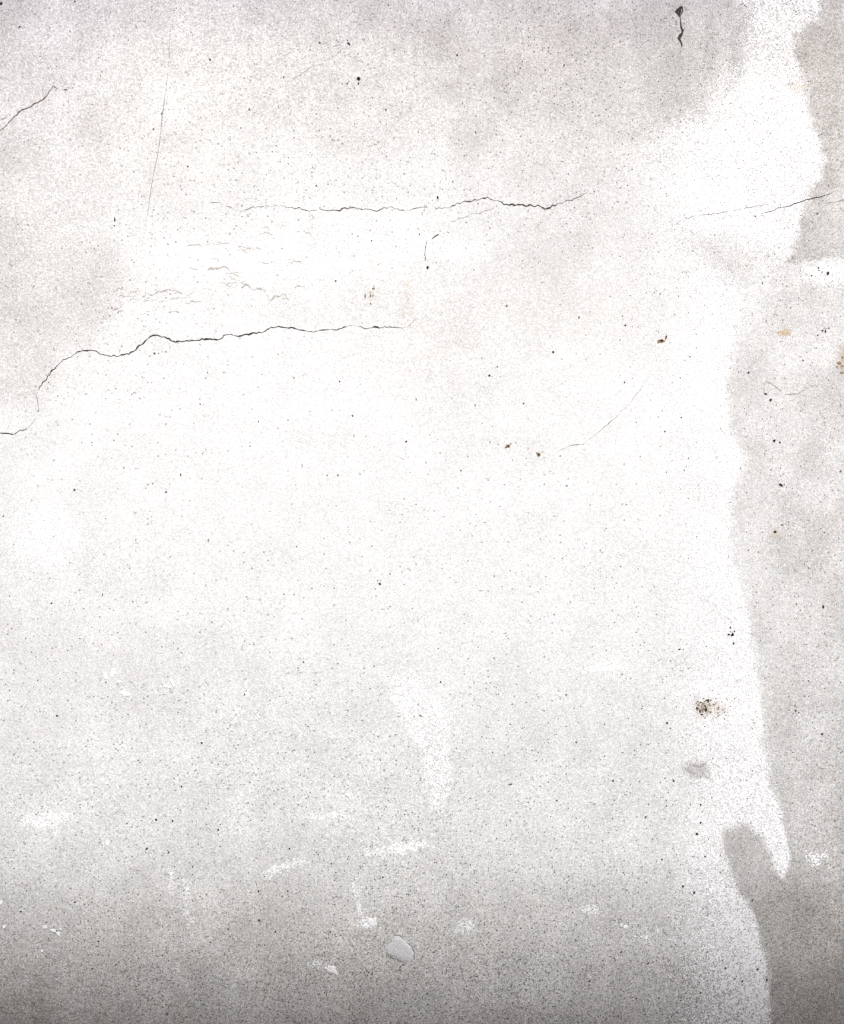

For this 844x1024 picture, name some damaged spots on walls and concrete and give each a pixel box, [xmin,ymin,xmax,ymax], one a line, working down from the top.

crack [672,6,684,47]
crack [1,86,67,130]
crack [211,193,585,261]
water stain [800,258,844,288]
crack [2,318,417,435]
water stain [613,0,830,1024]